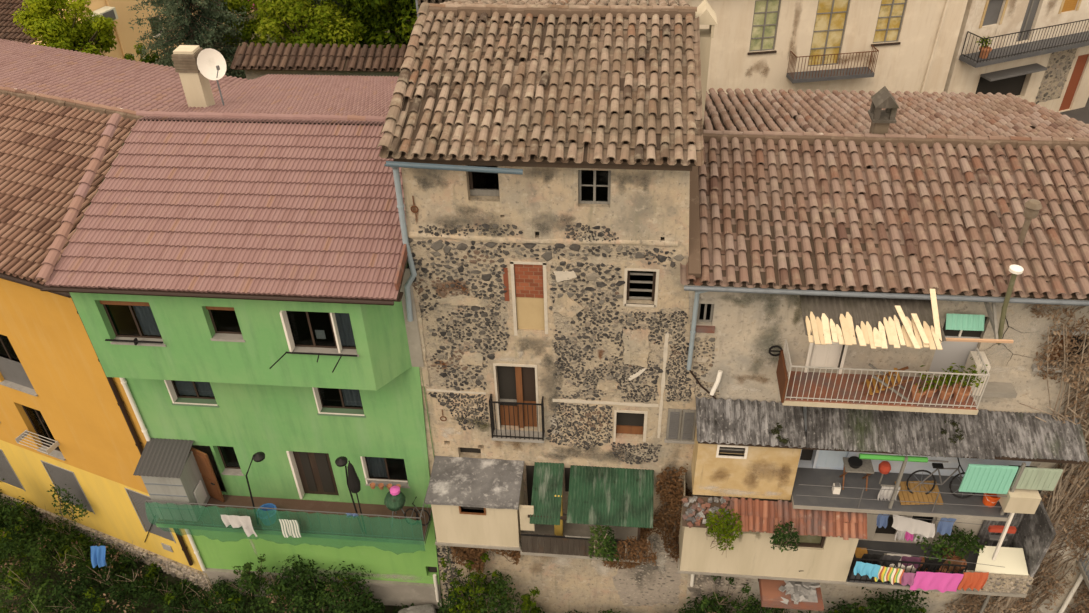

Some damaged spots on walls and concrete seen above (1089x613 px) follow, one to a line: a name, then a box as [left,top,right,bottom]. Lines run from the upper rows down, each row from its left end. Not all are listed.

spalling [406,223,720,465]